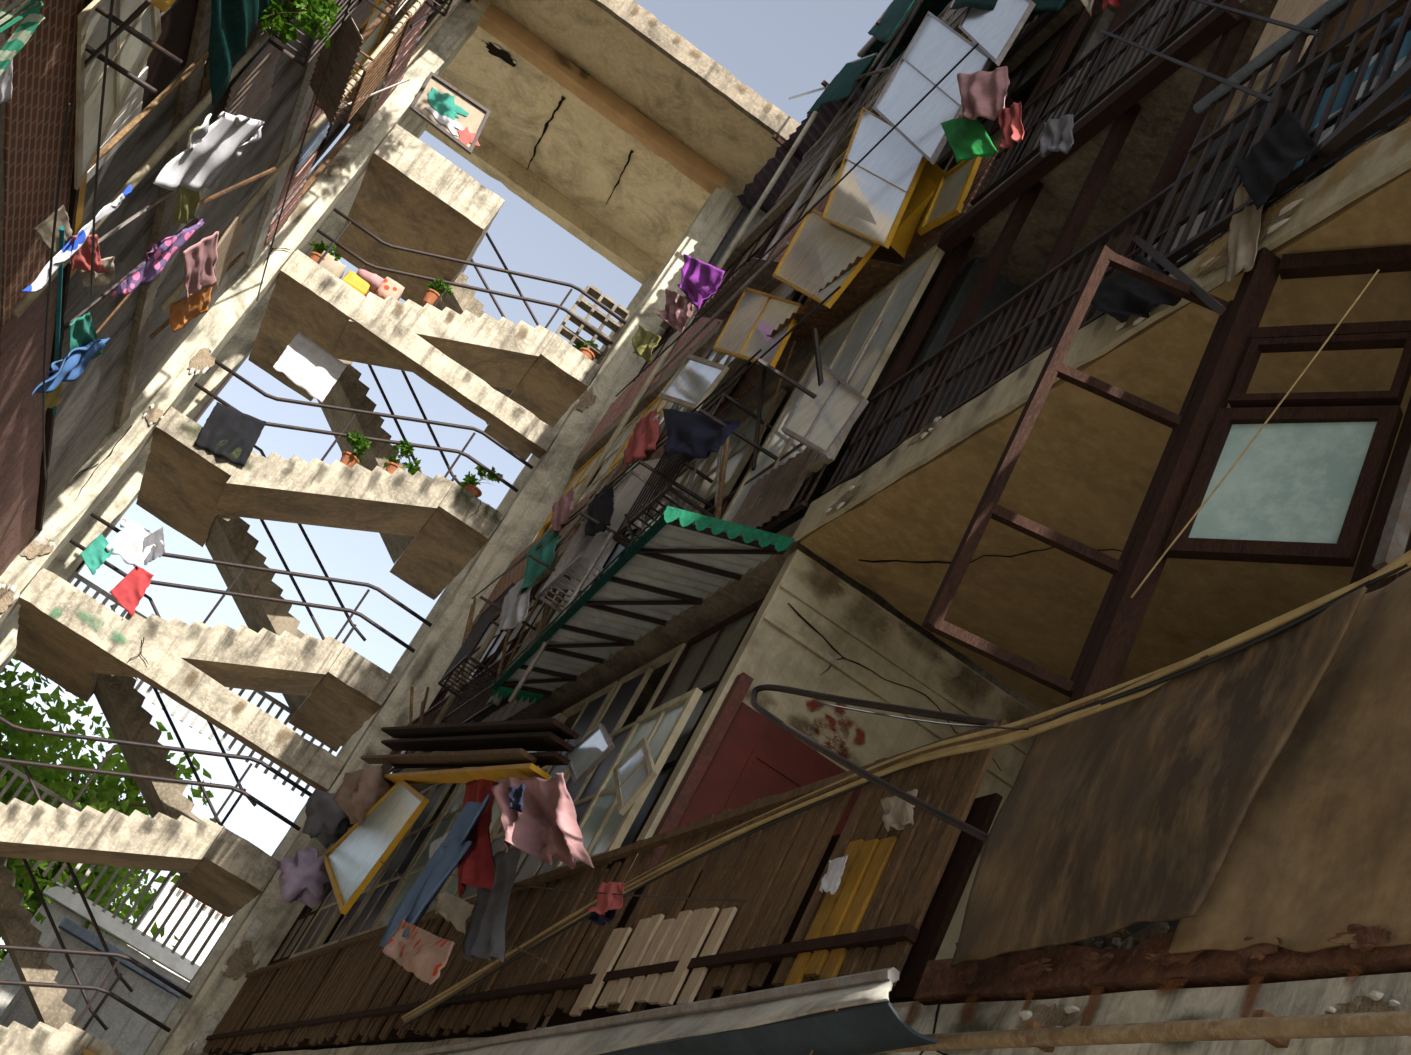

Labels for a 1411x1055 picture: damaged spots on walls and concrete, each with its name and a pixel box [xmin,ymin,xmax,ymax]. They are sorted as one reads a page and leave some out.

crack [527,96,566,170]
crack [858,547,1054,564]
crack [788,603,958,734]
rust [1079,951,1114,1026]
rust [1237,936,1281,1018]
rust [1326,923,1391,982]